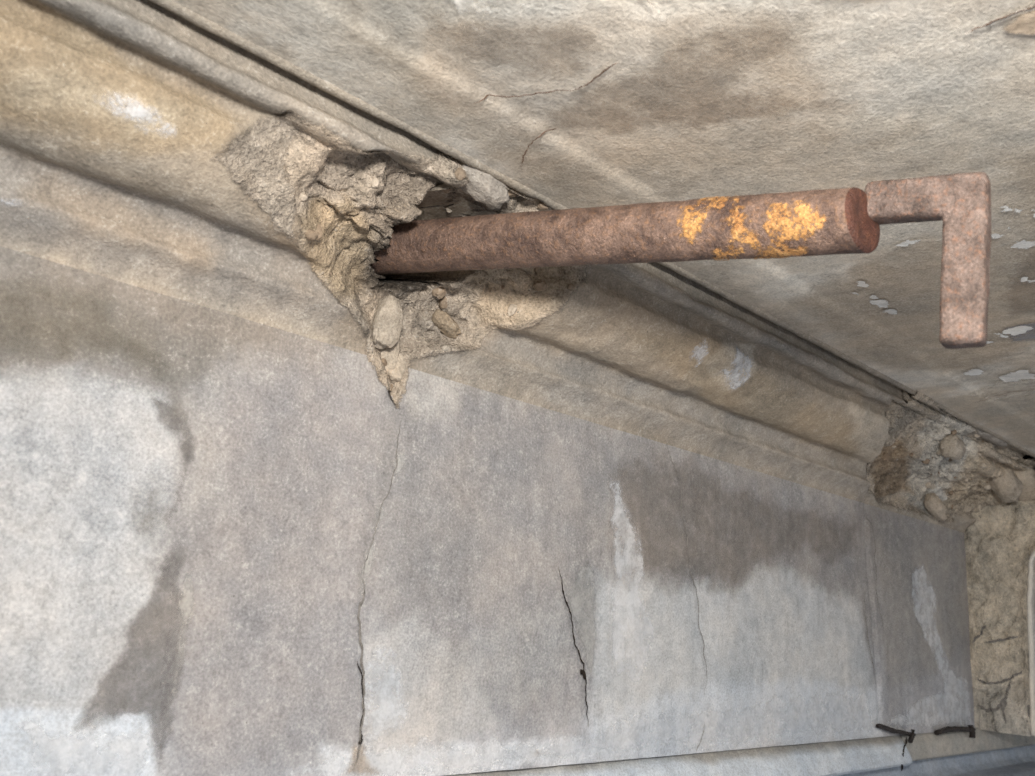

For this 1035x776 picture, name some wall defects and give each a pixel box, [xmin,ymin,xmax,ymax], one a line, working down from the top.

crack [965,6,1035,34]
spalling [212,111,587,408]
corrosion [677,196,826,261]
peeling [1011,240,1035,249]
peeling [853,281,897,314]
peeling [986,324,1035,344]
peeling [1000,370,1035,382]
water stain [156,402,193,459]
spalling [866,390,1035,523]
crack [354,428,400,768]
water stain [20,555,193,776]
crack [558,566,589,727]